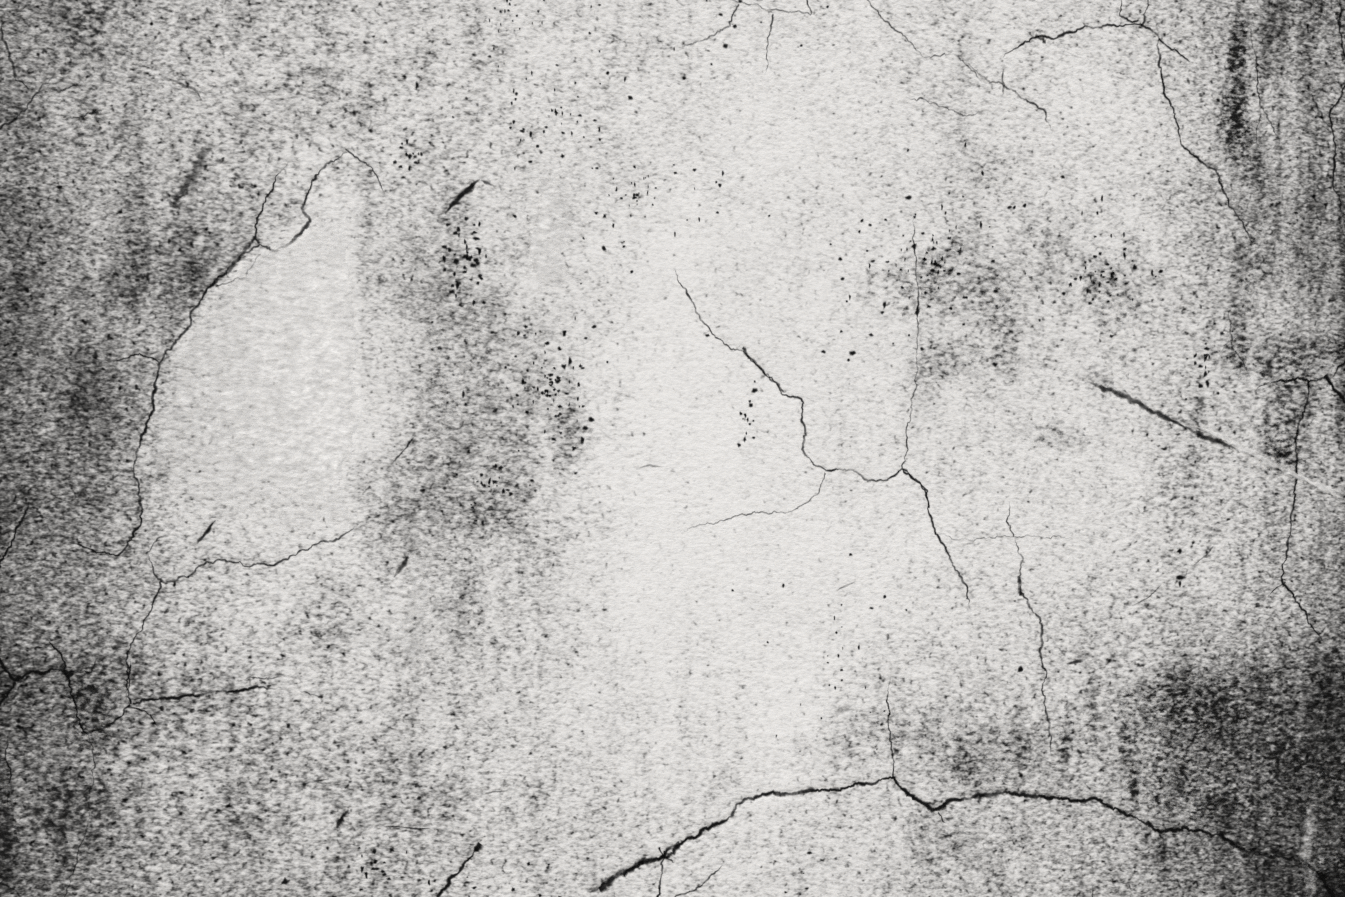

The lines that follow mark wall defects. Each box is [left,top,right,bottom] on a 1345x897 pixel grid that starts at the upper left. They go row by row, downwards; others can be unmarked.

crack [0,26,98,129]
crack [685,0,812,69]
crack [868,0,1250,238]
crack [0,149,383,897]
crack [676,226,1057,750]
crack [598,683,1345,897]